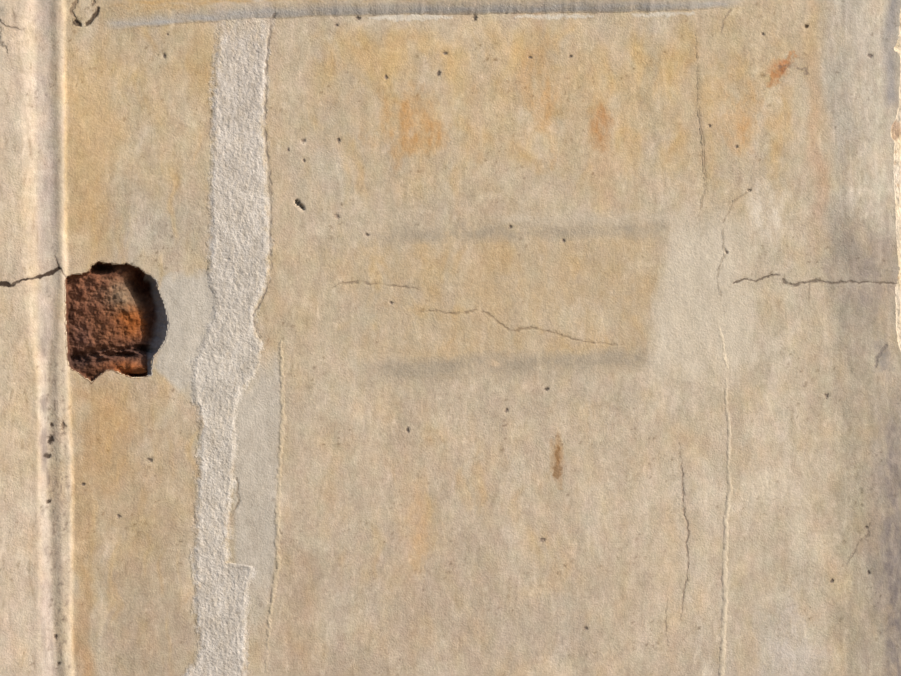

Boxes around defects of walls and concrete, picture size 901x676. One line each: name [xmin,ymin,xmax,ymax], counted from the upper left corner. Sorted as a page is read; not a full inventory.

crack [695,28,707,225]
corrosion [697,50,809,159]
crack [0,255,67,288]
crack [330,280,622,346]
crack [717,186,897,313]
corrosion [549,426,566,490]